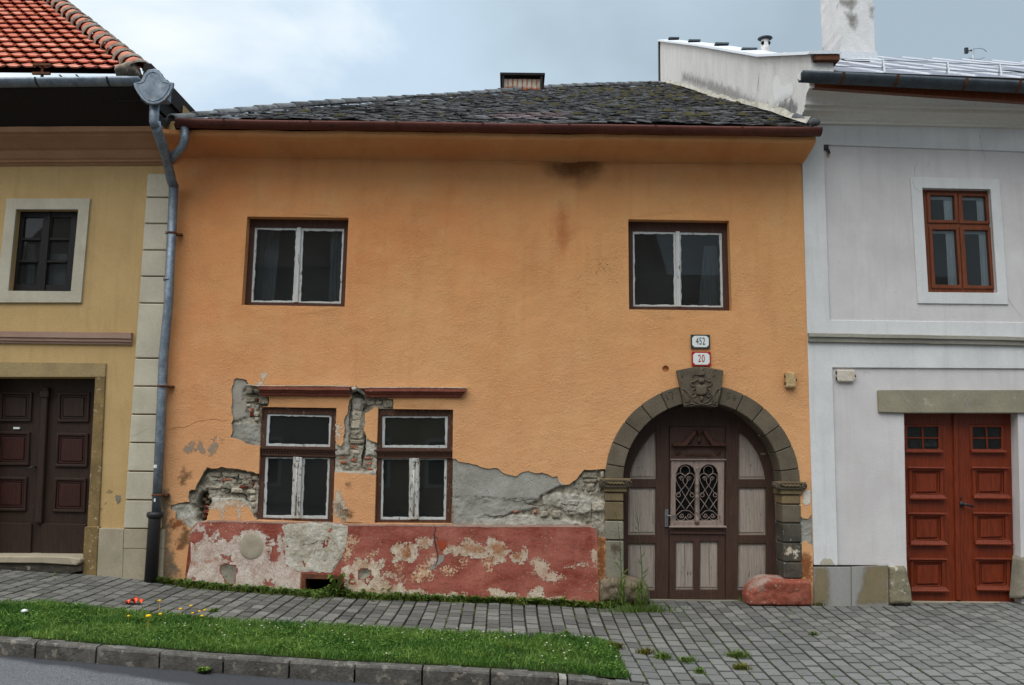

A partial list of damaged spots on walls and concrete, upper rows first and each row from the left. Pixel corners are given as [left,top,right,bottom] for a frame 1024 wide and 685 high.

spalling [231,372,463,475]
peeling [172,437,301,593]
spalling [341,459,605,601]